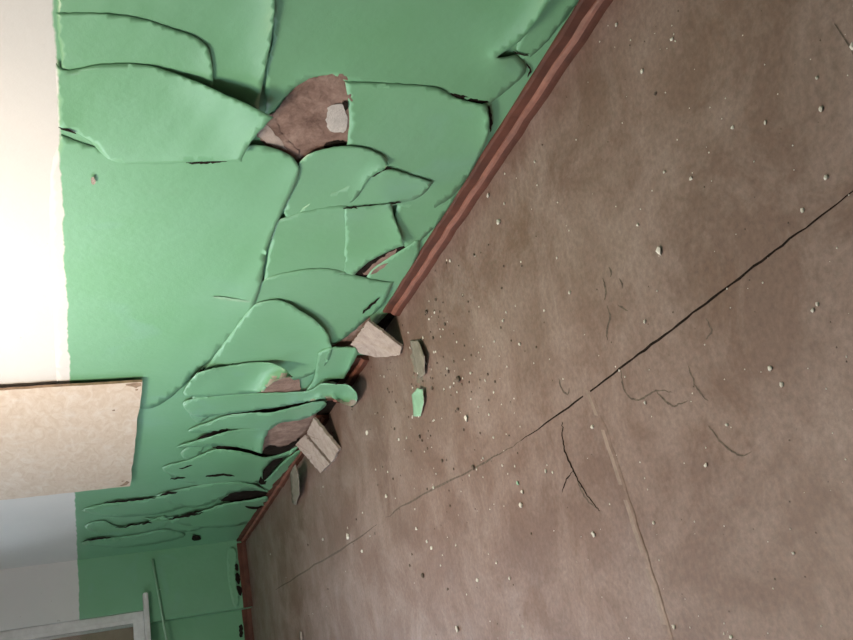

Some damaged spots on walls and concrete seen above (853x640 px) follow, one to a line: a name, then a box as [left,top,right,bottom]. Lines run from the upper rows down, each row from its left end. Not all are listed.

peeling [49,0,579,548]
crack [276,191,853,590]